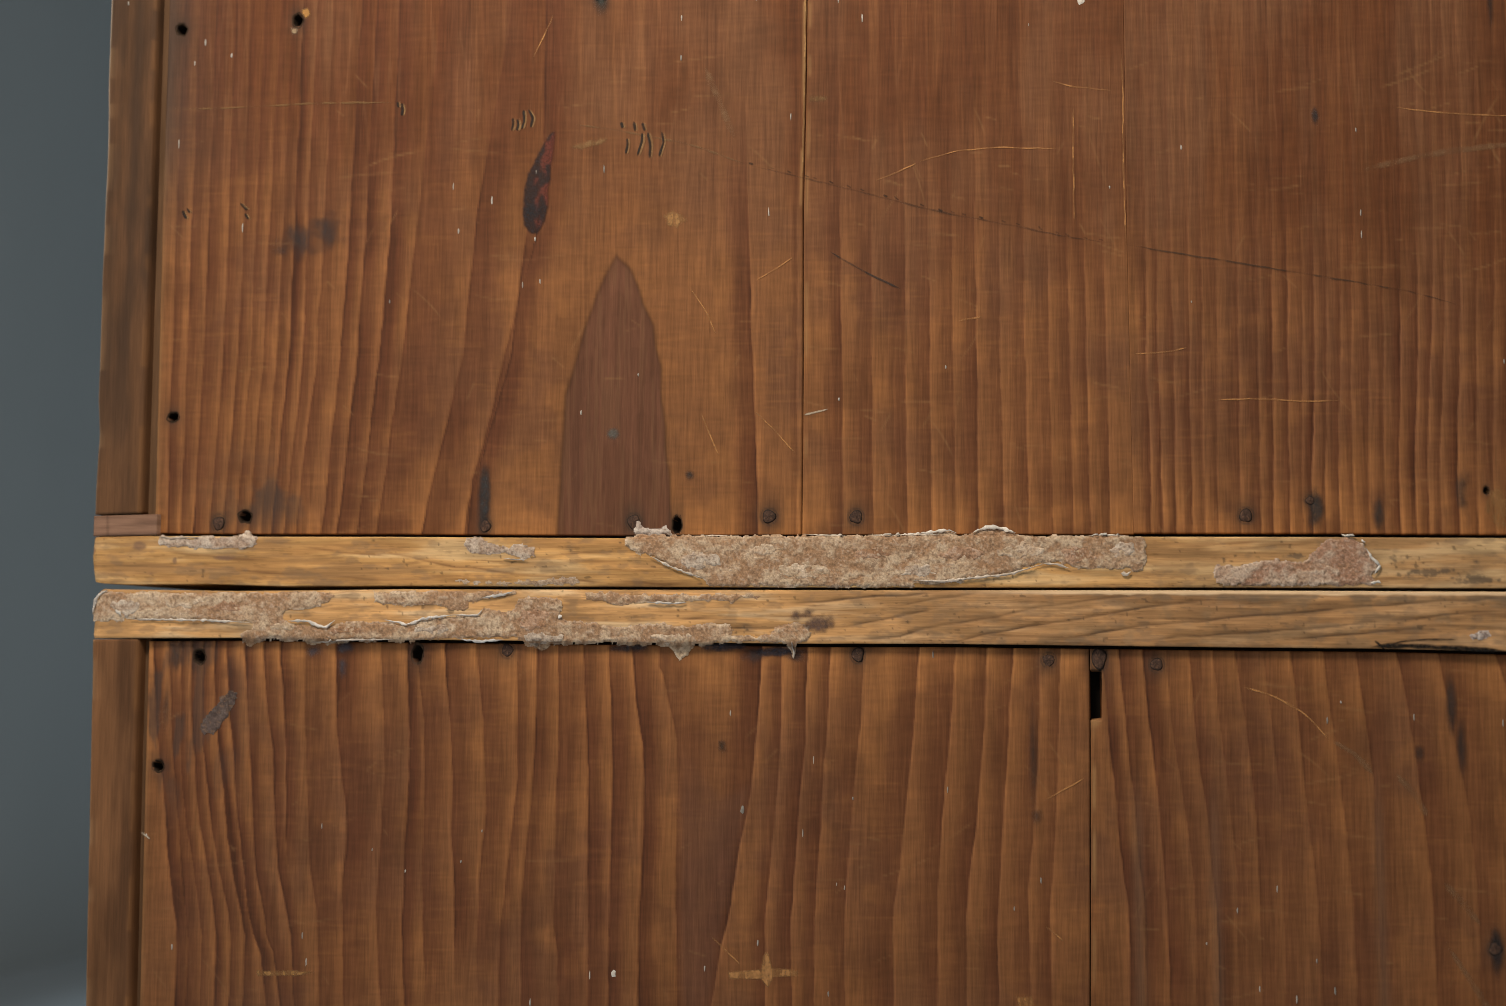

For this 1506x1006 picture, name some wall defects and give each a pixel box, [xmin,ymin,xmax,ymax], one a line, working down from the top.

peeling [747,544,830,579]
peeling [854,525,1135,583]
peeling [1342,534,1381,584]
peeling [92,590,250,623]
peeling [270,535,760,647]